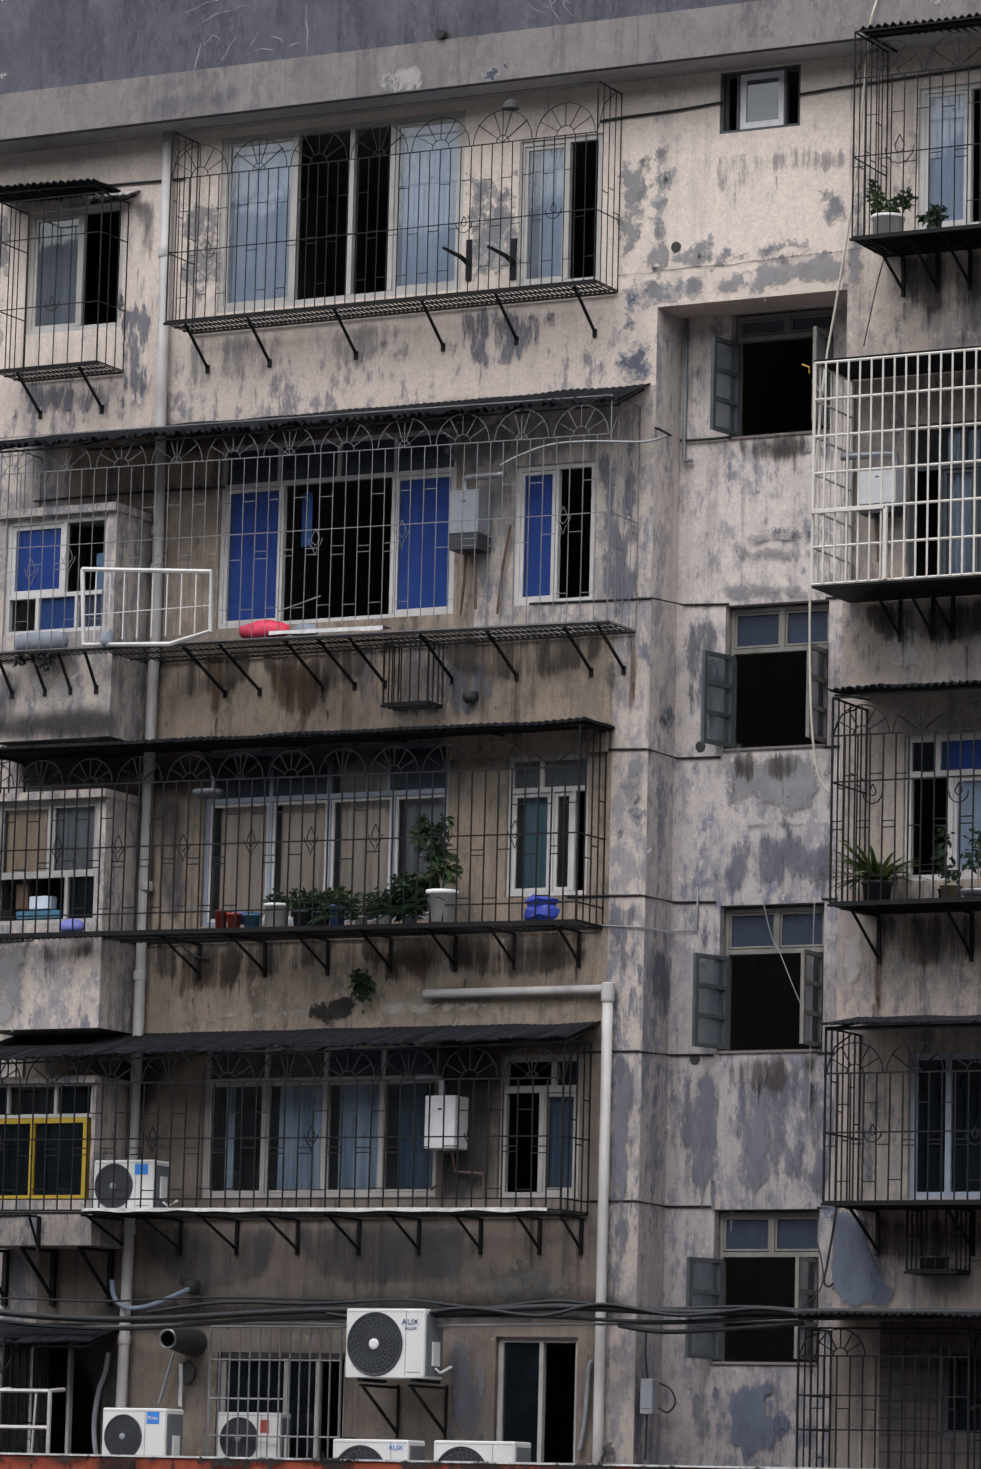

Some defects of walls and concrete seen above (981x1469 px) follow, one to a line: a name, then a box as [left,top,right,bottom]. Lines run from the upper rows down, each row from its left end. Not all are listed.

water stain [462,309,554,374]
water stain [714,818,830,899]
water stain [255,997,364,1026]
water stain [385,1001,486,1025]
water stain [678,1070,719,1212]
water stain [736,1073,893,1308]